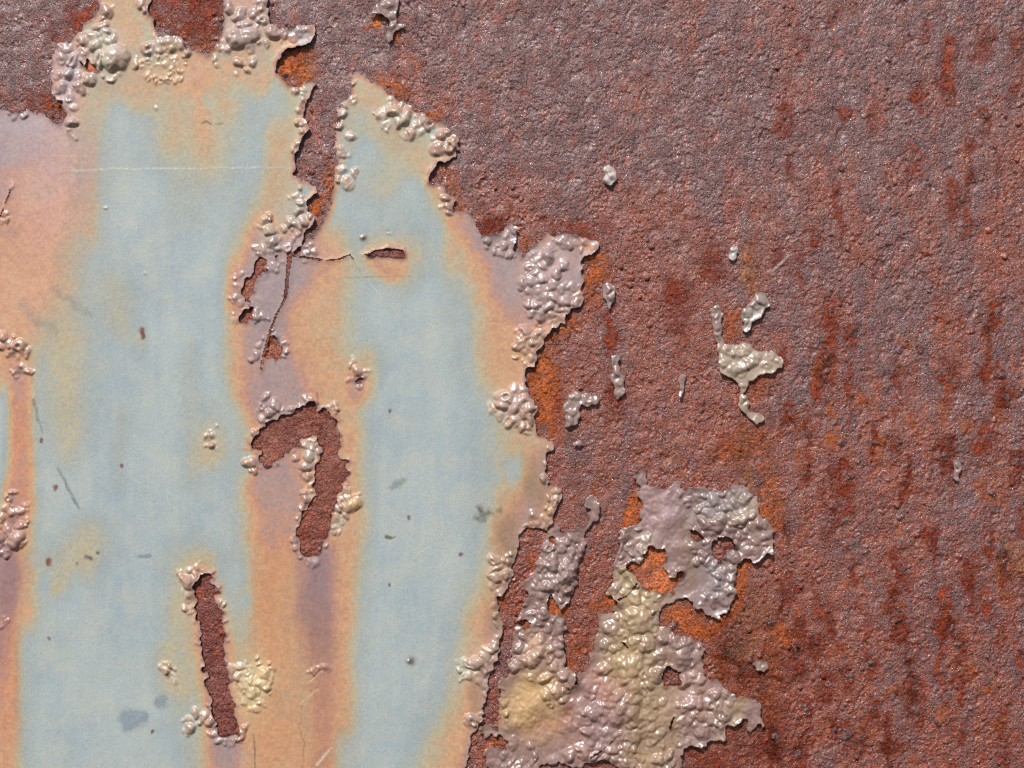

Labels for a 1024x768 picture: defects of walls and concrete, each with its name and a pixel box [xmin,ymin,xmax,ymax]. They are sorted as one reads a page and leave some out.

corrosion [284,69,305,88]
crack [271,254,354,327]
corrosion [525,382,543,411]
corrosion [690,529,735,562]
corrosion [625,545,683,595]
corrosion [456,557,504,660]
corrosion [659,597,718,629]
corrosion [465,527,546,768]
corrosion [661,666,682,686]
corrosion [416,663,488,768]
corrosion [539,759,619,768]